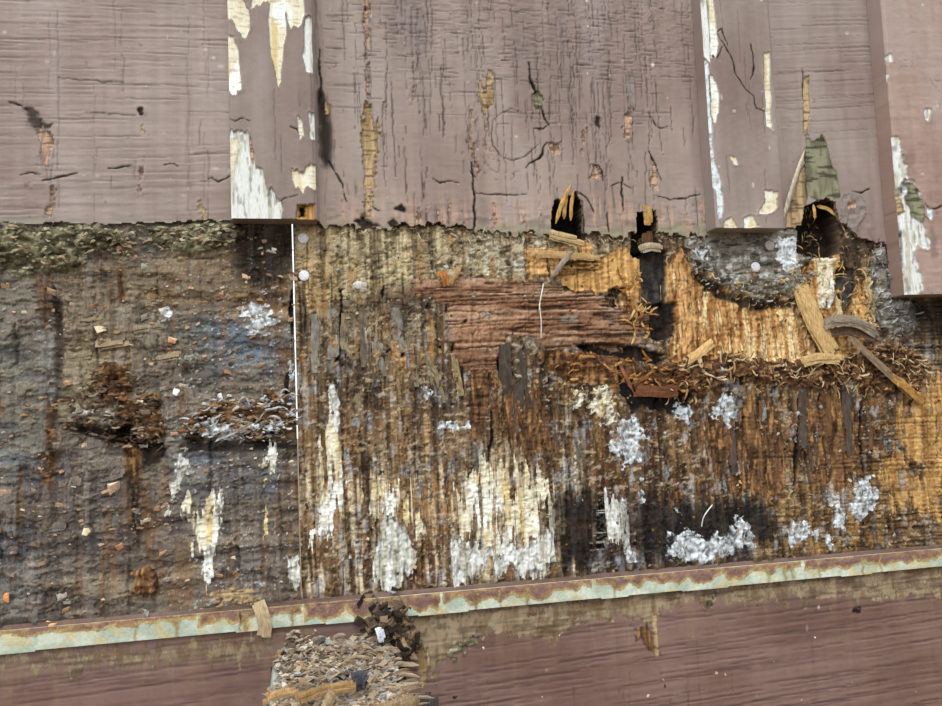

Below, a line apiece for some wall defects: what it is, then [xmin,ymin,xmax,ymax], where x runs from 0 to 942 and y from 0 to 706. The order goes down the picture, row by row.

peeling [227,0,313,95]
crack [711,28,757,109]
peeling [230,129,283,219]
peeling [292,164,316,193]
crack [290,49,380,211]
crack [433,162,523,231]
crack [516,63,549,168]
spalling [618,137,933,415]
rust [126,445,152,546]
rust [0,609,256,640]
rust [268,549,942,626]
rust [635,611,660,657]